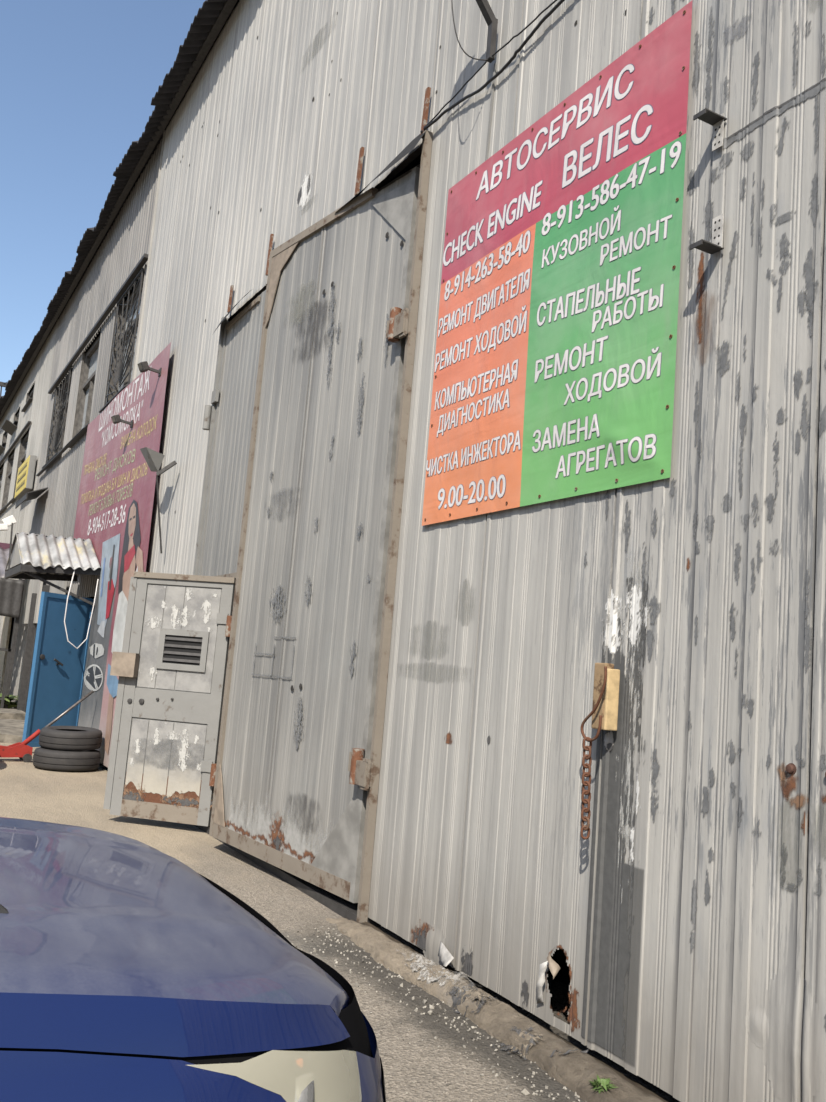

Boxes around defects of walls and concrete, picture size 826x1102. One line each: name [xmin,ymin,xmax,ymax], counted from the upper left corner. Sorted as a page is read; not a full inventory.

peeling [740,173,796,312]
rust [696,252,704,343]
peeling [798,249,818,336]
peeling [693,342,787,554]
peeling [794,367,826,454]
peeling [734,539,779,593]
rust [122,785,145,801]
peeling [130,728,201,772]
rust [160,794,212,808]
rust [225,817,315,863]
peeling [581,501,660,1060]
rust [778,763,809,835]